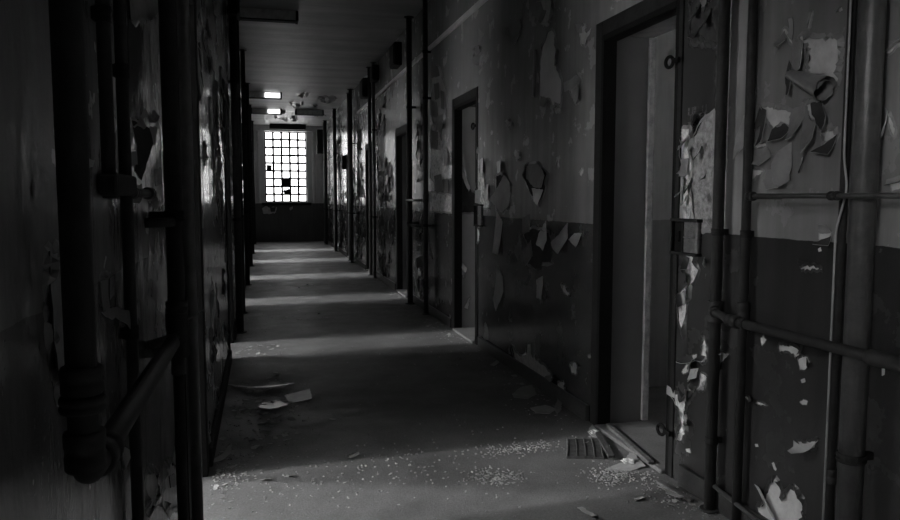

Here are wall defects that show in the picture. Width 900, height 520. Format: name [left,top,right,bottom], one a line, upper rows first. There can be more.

peeling [532,28,581,108]
peeling [733,17,845,190]
peeling [522,155,560,208]
peeling [674,108,715,234]
peeling [522,214,582,300]
peeling [675,256,705,341]
peeling [666,331,731,444]
peeling [777,342,812,383]
peeling [787,436,820,454]
peeling [754,462,807,520]